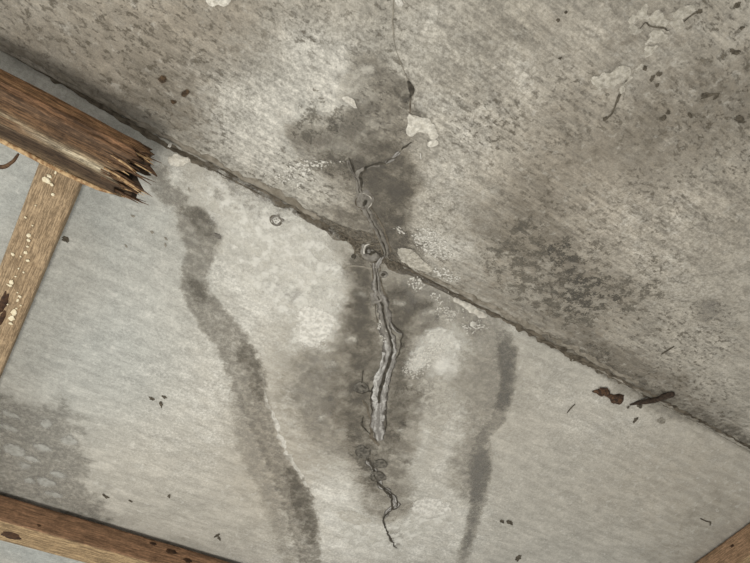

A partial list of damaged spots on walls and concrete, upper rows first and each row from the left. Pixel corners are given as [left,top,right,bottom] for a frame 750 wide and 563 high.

crack [392,0,408,81]
leakage [275,159,341,189]
peeling [398,105,439,147]
leakage [198,171,343,350]
leakage [393,226,459,282]
crack [347,142,412,548]
leakage [404,292,487,438]
leakage [261,372,320,520]